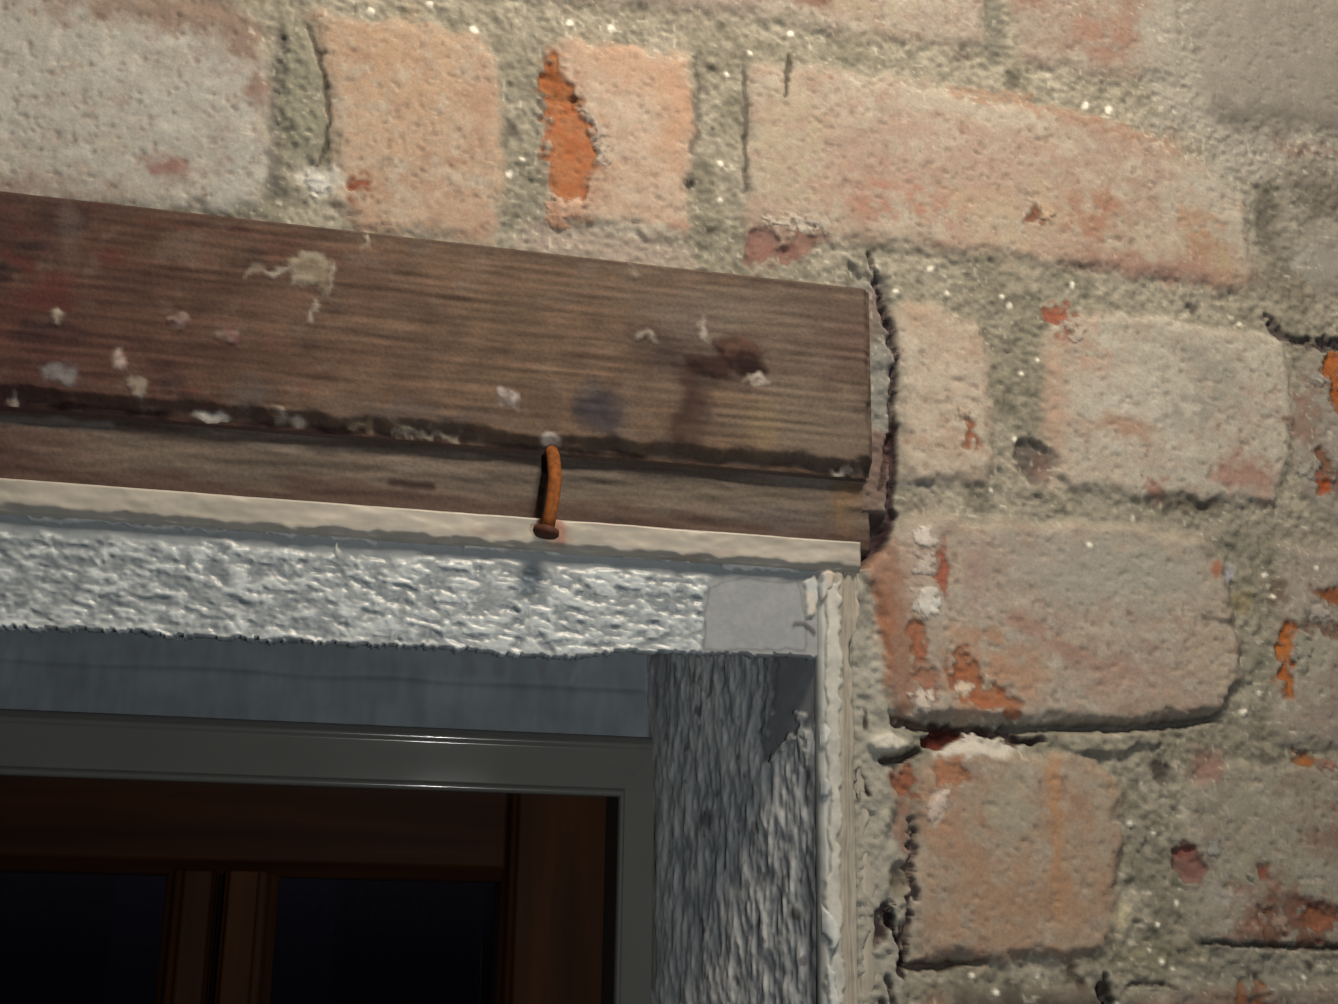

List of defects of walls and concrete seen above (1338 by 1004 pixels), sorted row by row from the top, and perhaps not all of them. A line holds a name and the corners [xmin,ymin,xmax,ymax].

spalling [538,52,612,230]
crack [0,255,898,560]
crack [1263,315,1338,353]
spalling [1306,351,1338,413]
spalling [905,526,1024,720]
spalling [1274,587,1338,698]
crack [854,710,1216,798]
crack [873,818,985,1004]
crack [1095,974,1177,1004]
crack [1201,941,1338,950]